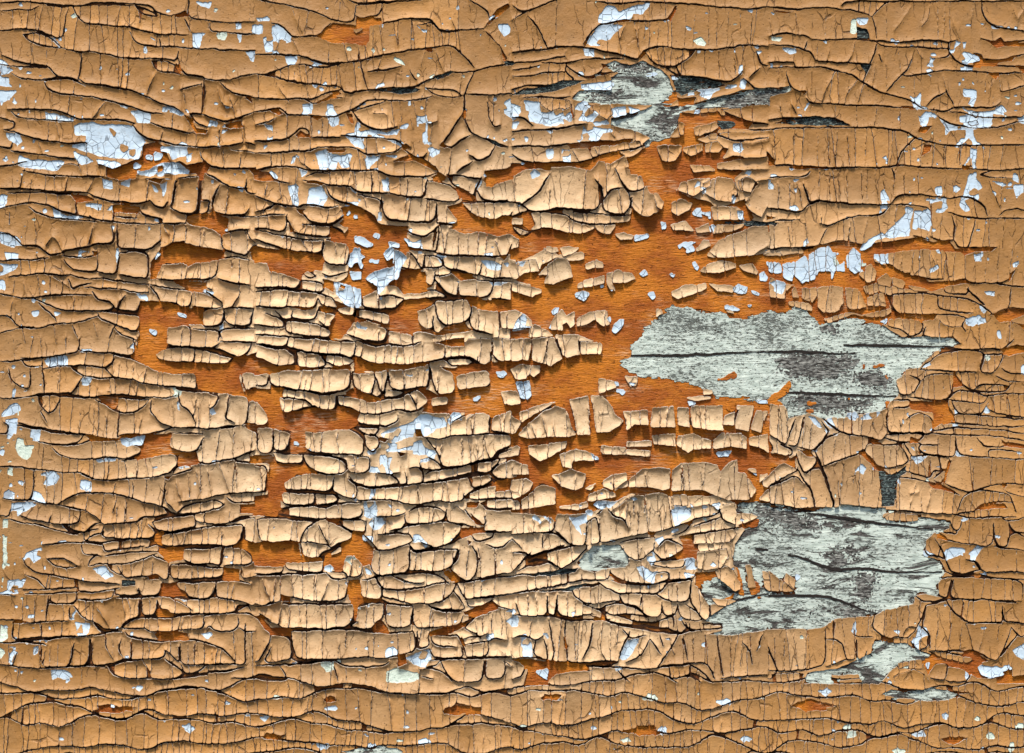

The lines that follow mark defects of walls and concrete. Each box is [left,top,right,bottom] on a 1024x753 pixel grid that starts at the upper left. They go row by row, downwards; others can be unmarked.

crack [7,108,135,124]
crack [256,1,1023,206]
crack [1,202,165,256]
peeling [356,246,604,399]
peeling [620,301,959,419]
peeling [519,396,590,439]
crack [358,465,488,497]
peeling [528,441,599,490]
peeling [601,433,747,457]
peeling [759,404,909,513]
peeling [645,460,757,591]
crack [291,631,417,661]